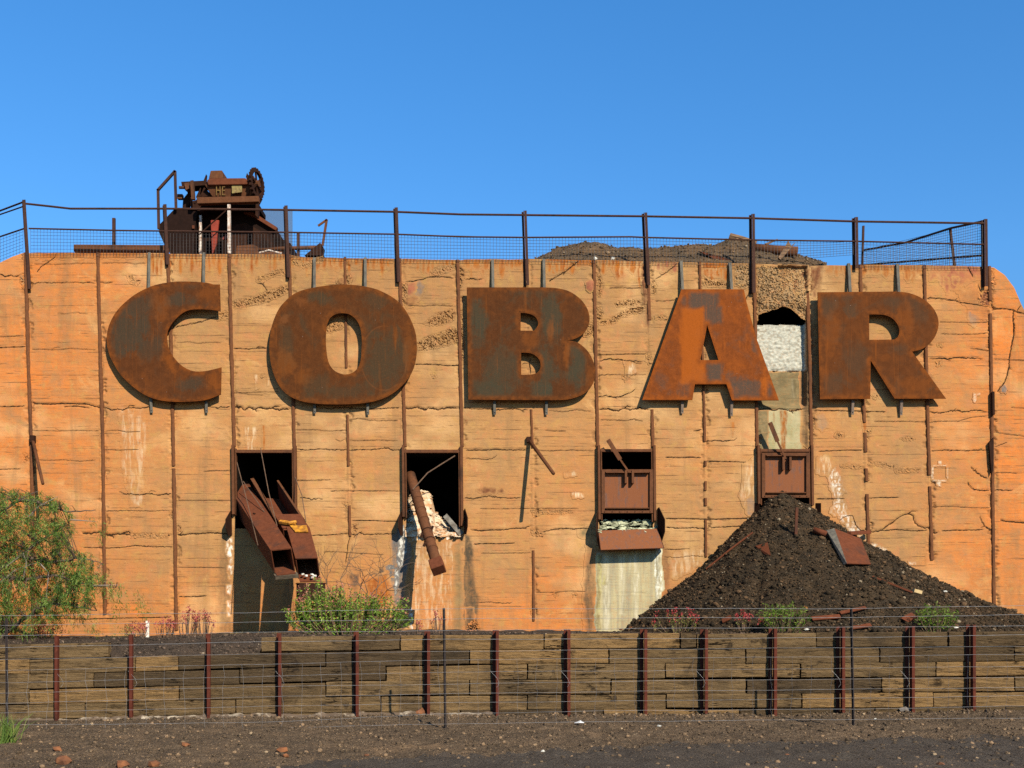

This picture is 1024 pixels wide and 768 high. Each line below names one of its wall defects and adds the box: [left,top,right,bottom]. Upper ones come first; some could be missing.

spalling [702,264,807,326]
leakage [738,318,889,551]
crack [759,267,1024,534]
leakage [364,523,482,631]
leakage [581,542,706,632]